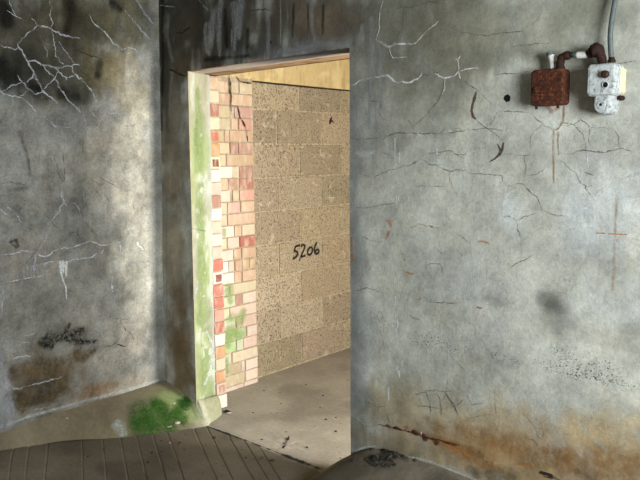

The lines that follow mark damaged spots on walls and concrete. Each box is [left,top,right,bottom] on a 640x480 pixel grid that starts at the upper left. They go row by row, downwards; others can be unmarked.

crack [129,0,173,40]
crack [376,2,437,58]
crack [0,0,140,149]
crack [229,56,478,141]
crack [2,154,121,311]
corrosion [379,424,472,457]